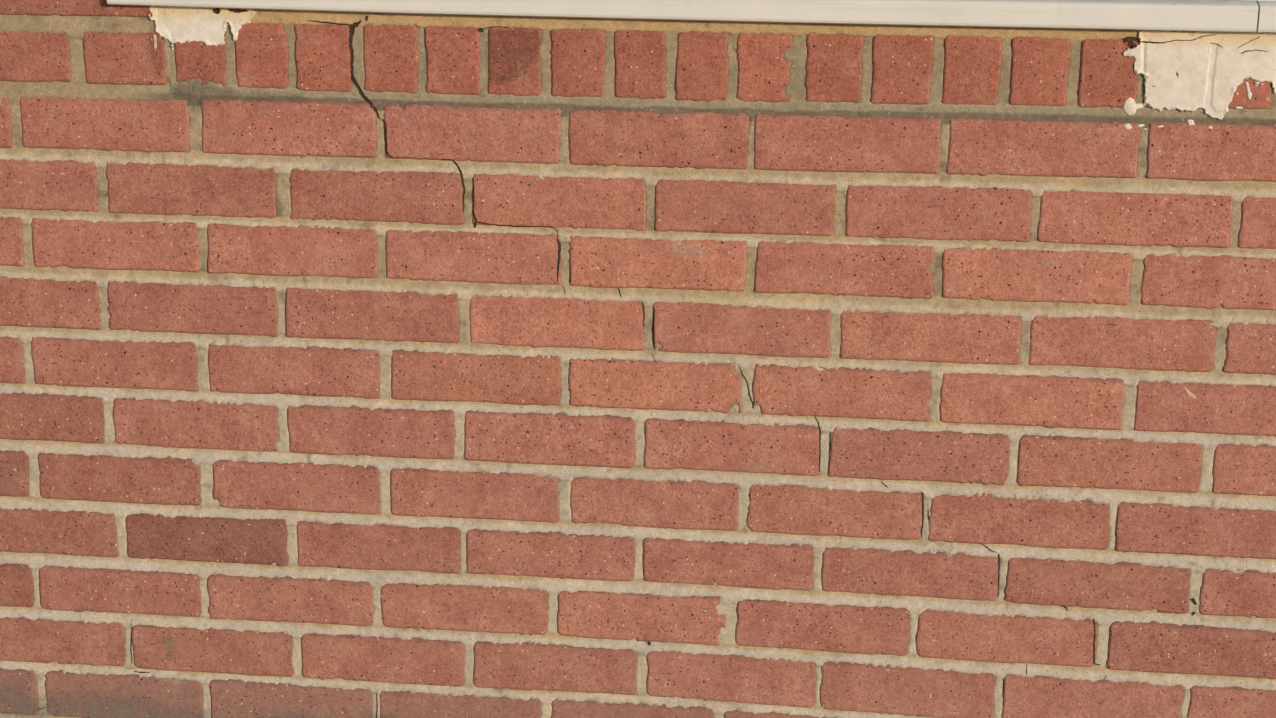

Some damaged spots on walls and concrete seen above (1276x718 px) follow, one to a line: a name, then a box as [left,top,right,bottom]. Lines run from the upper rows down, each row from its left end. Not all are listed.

peeling [149,6,256,51]
peeling [1123,30,1276,120]
crack [308,20,571,292]
crack [617,287,656,362]
crack [739,366,754,409]
crack [814,415,831,473]
crack [921,492,929,535]
crack [980,542,1000,597]
crack [1059,605,1107,680]